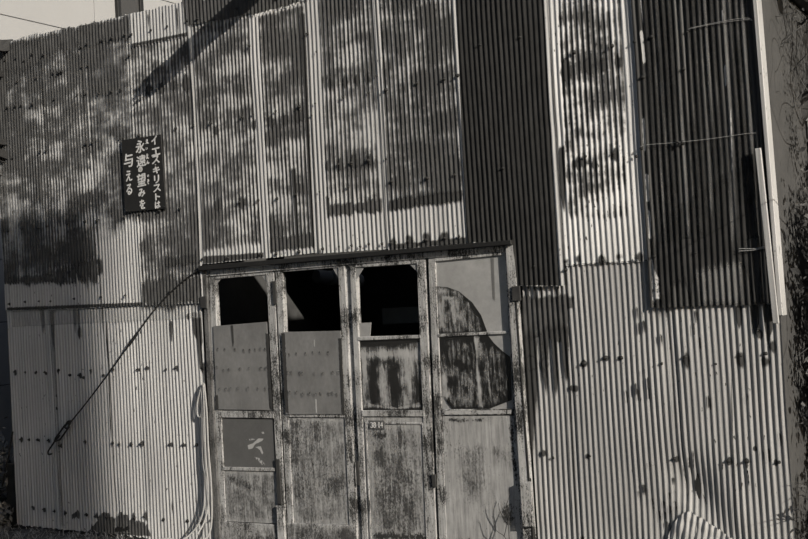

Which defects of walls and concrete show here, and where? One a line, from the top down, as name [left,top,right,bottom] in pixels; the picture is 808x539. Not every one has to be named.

corrosion [32,506,151,536]
corrosion [0,0,315,463]
corrosion [281,333,345,414]
corrosion [319,0,776,456]